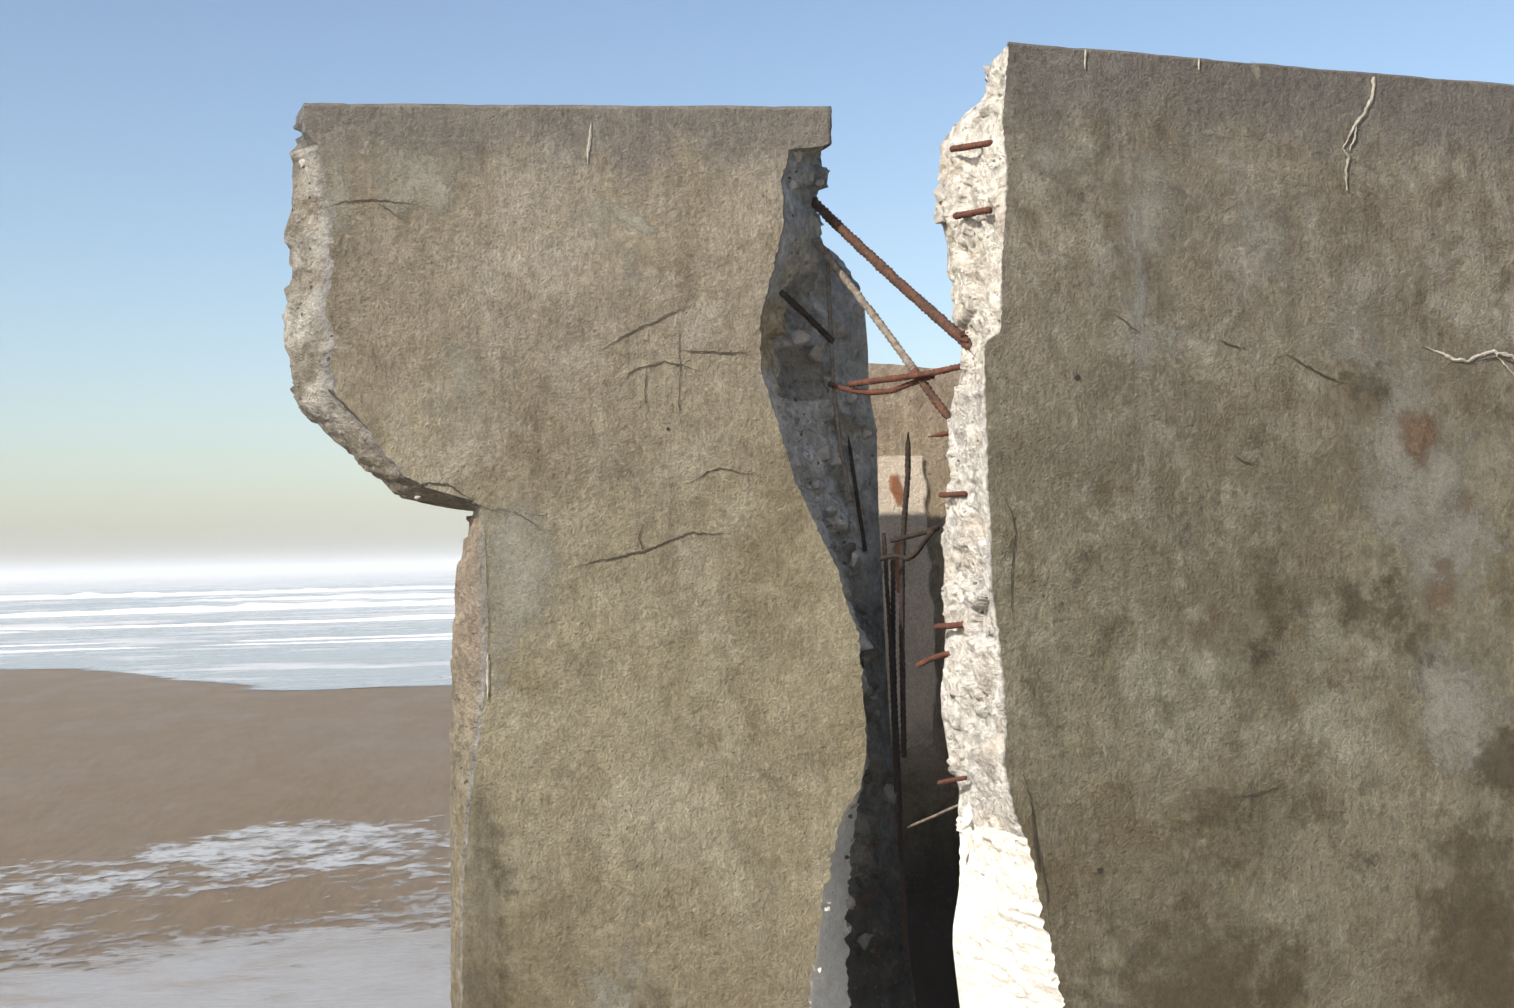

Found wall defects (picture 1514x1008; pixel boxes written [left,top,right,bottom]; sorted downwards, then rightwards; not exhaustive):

crack [1342,77,1376,190]
crack [601,302,754,435]
crack [1422,346,1514,375]
spalling [281,104,487,1008]
crack [571,524,730,570]
crack [688,467,757,484]
rust [889,474,903,505]
spalling [759,41,1065,1008]